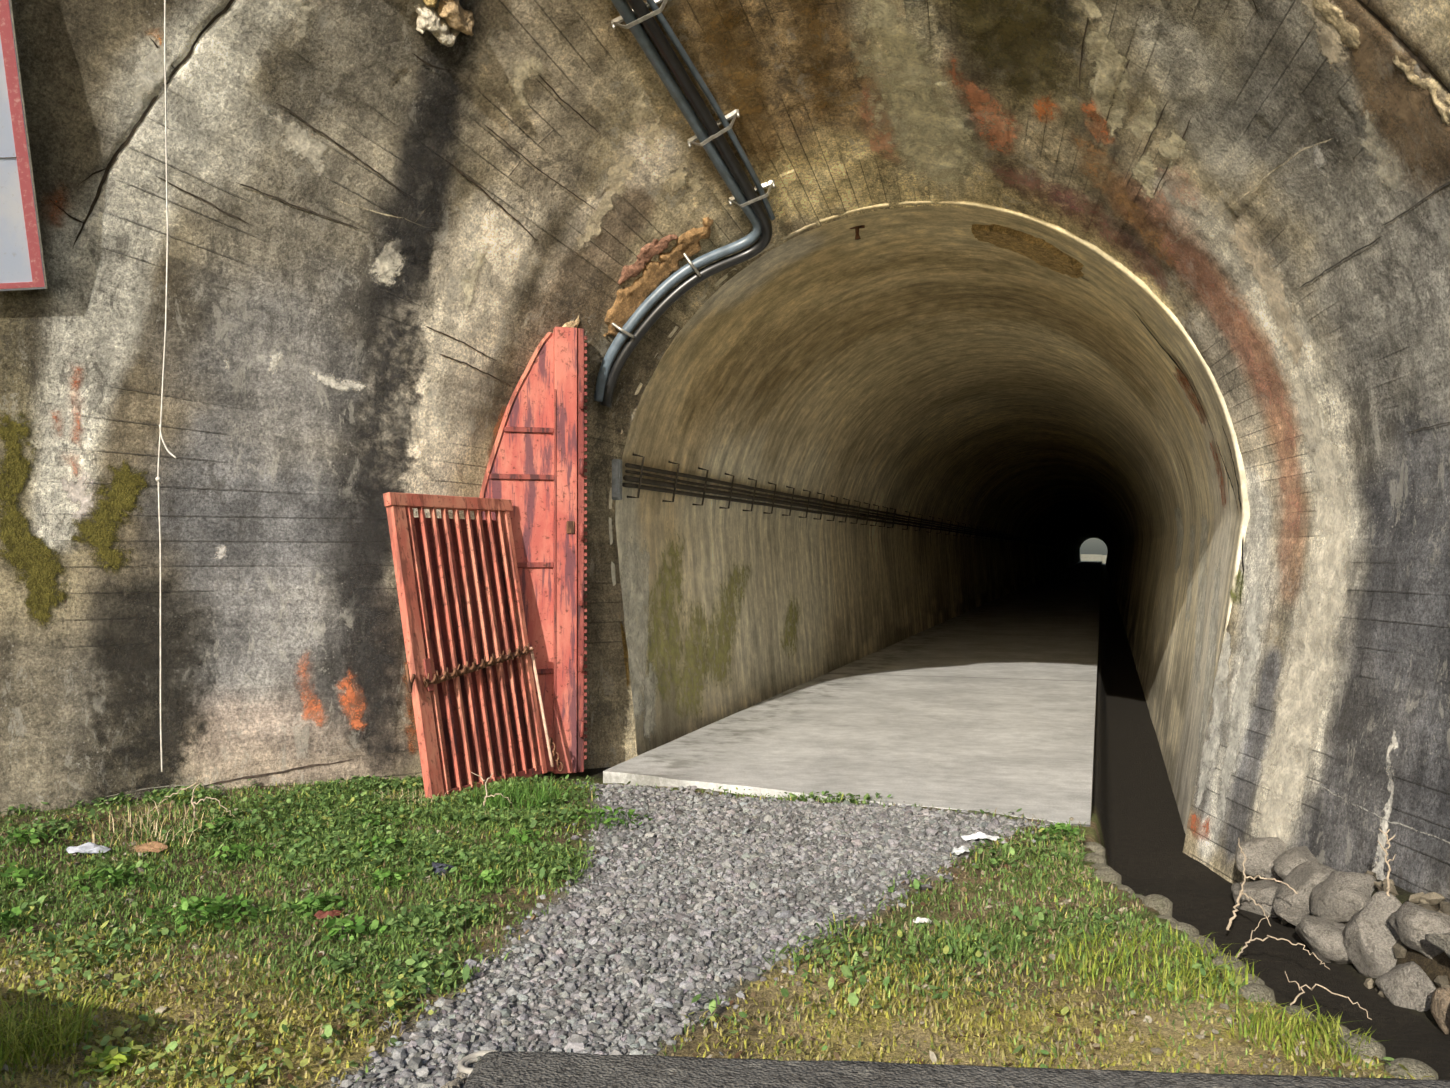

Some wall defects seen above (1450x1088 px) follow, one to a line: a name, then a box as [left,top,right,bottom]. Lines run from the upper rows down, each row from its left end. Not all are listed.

crack [52,0,234,248]
crack [156,176,362,230]
crack [275,102,414,204]
spalling [414,0,475,47]
water stain [691,0,790,175]
water stain [851,0,978,182]
water stain [951,0,1082,108]
rust [947,60,1182,290]
crack [1356,0,1450,94]
water stain [335,35,475,765]
rust [1173,367,1226,506]
rust [340,677,364,728]